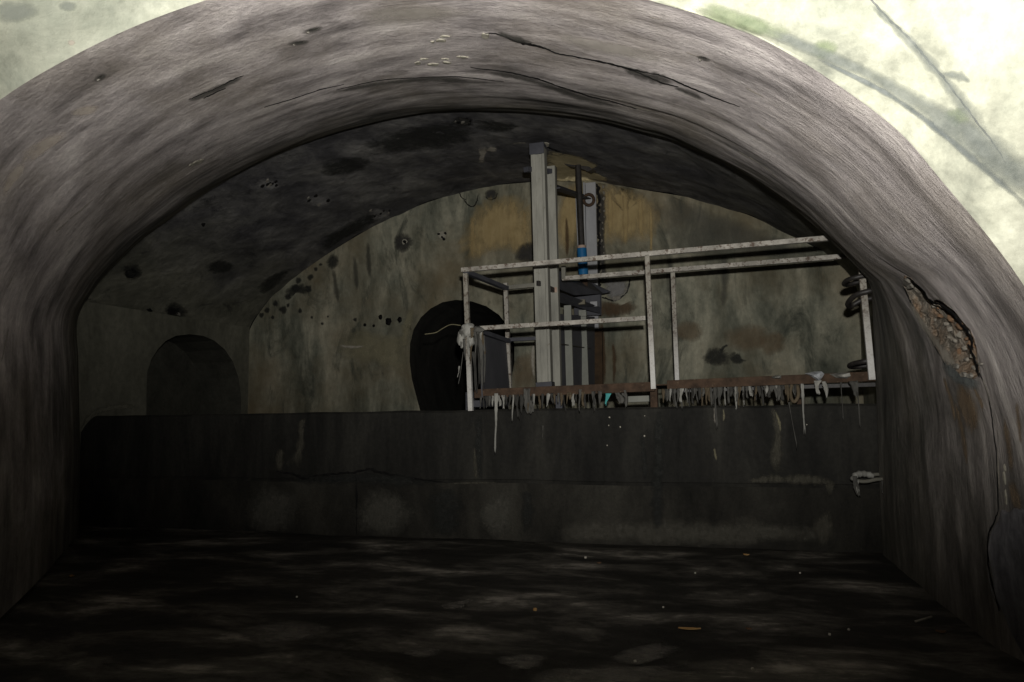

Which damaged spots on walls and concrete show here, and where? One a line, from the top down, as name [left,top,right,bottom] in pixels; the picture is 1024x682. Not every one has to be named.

crack [481,32,740,107]
spalling [902,275,983,387]
crack [979,373,999,512]